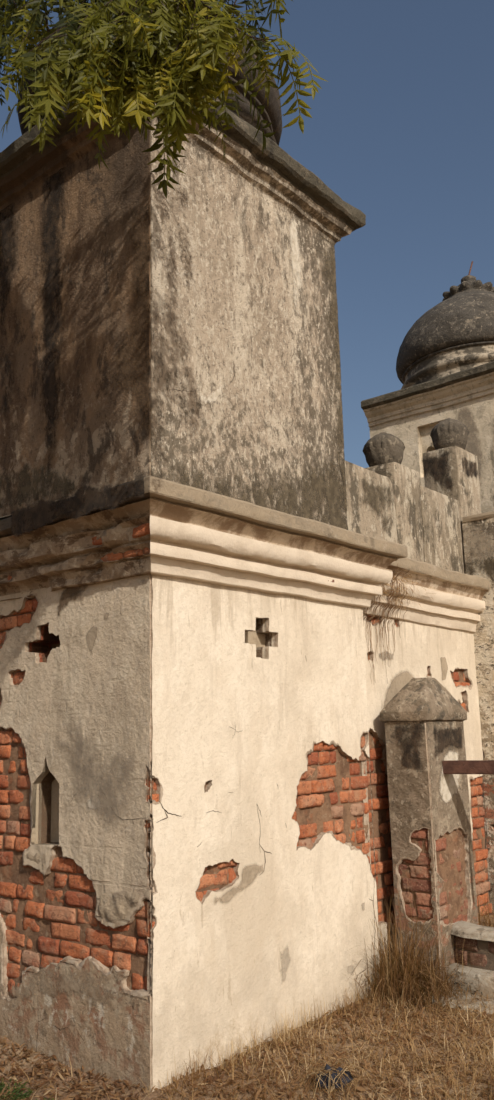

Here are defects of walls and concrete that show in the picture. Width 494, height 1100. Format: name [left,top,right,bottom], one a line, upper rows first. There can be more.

damp [290,220,302,314]
damp [0,168,74,506]
damp [116,209,150,425]
damp [152,240,348,530]
damp [459,407,482,476]
flaking render [92,523,150,562]
flaking render [0,593,39,649]
flaking render [0,668,26,708]
flaking render [426,657,473,713]
flaking render [0,726,163,1001]
flaking render [195,859,263,905]
flaking render [292,728,494,927]